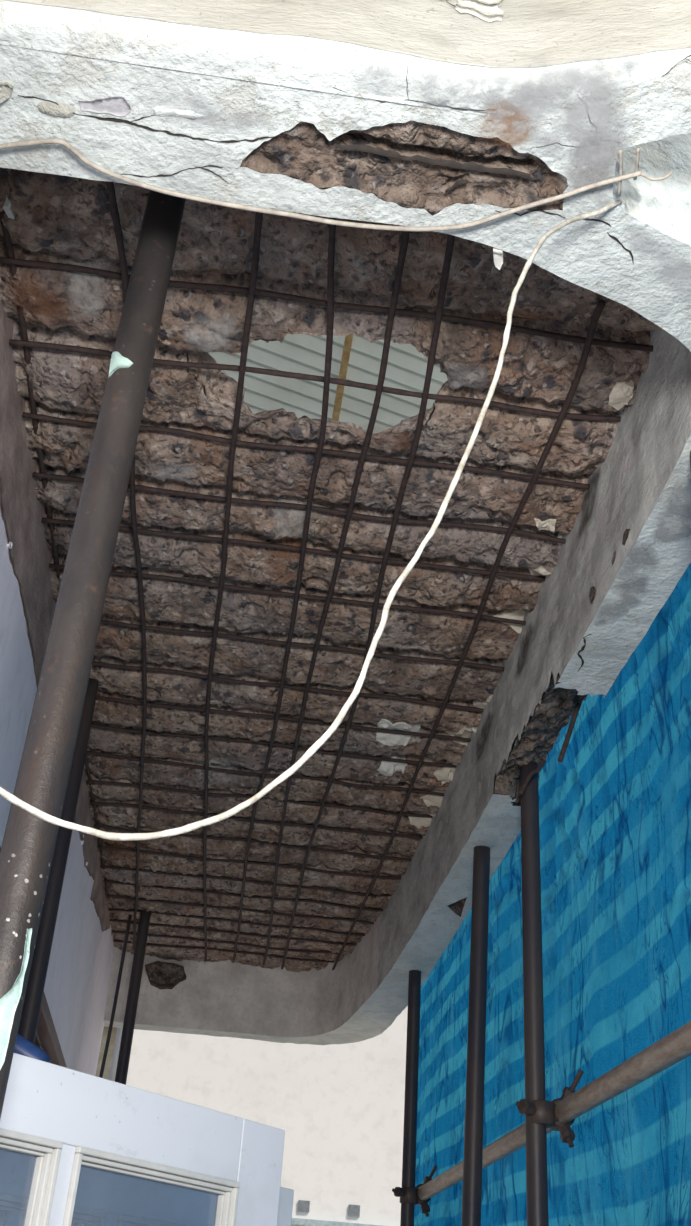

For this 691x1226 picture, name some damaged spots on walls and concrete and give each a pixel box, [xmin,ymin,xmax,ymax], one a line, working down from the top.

peeling [455,0,504,22]
peeling [0,81,14,104]
peeling [78,96,131,116]
crack [18,95,285,183]
spalling [240,120,568,216]
spalling [0,181,130,303]
crack [495,209,634,265]
peeling [0,301,112,687]
spalling [74,212,653,989]